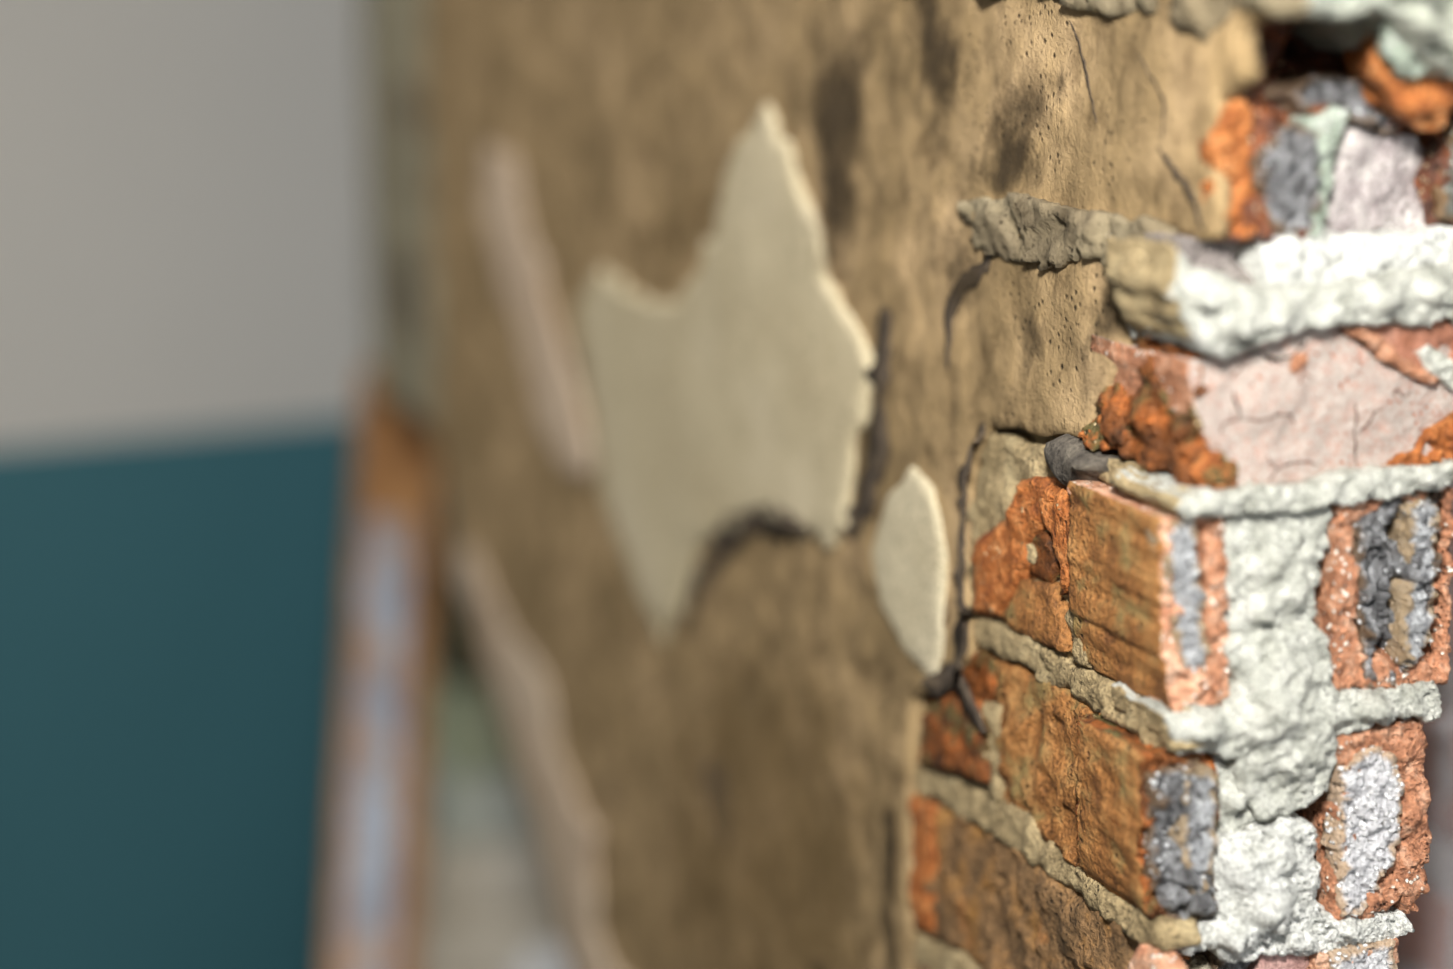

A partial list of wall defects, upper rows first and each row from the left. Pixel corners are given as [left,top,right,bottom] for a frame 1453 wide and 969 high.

crack [1069,20,1097,123]
crack [1138,55,1203,229]
spalling [1199,17,1453,242]
peeling [482,102,874,645]
spalling [1078,330,1239,489]
crack [1220,330,1373,482]
crack [1353,388,1412,468]
peeling [872,466,948,676]
spalling [971,476,1231,712]
spalling [1312,486,1453,692]
spalling [1075,712,1220,920]
spalling [1294,717,1432,921]